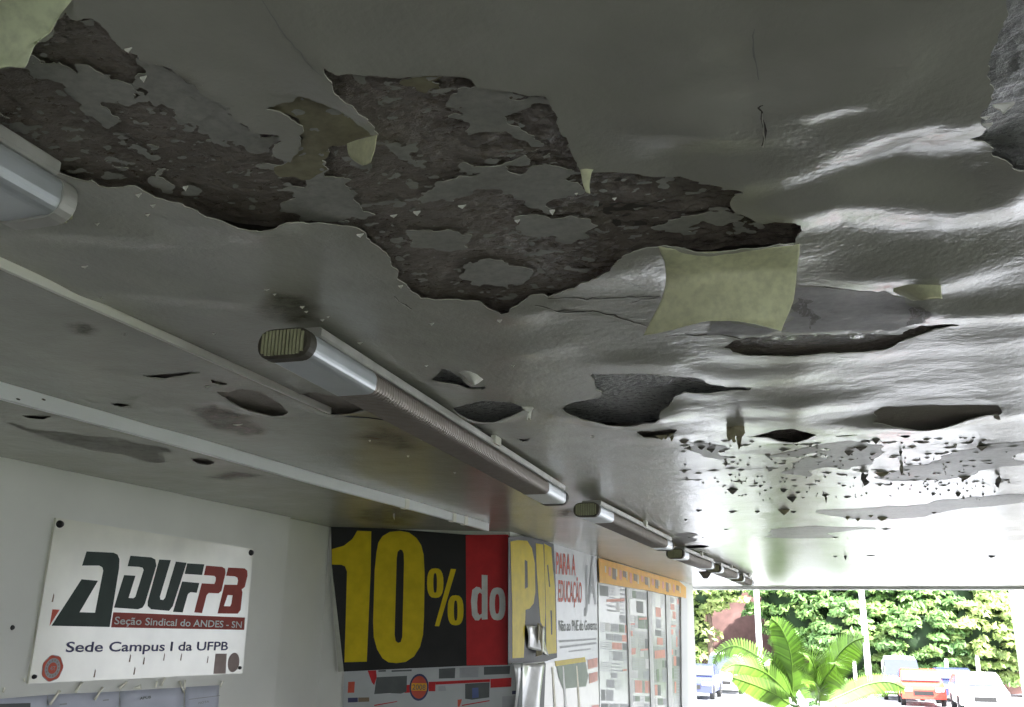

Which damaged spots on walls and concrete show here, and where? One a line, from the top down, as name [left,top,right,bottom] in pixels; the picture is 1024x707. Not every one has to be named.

peeling [0,13,860,326]
crack [758,105,767,148]
peeling [952,0,1024,170]
peeling [195,380,372,434]
peeling [422,365,1024,539]
peeling [707,287,957,363]